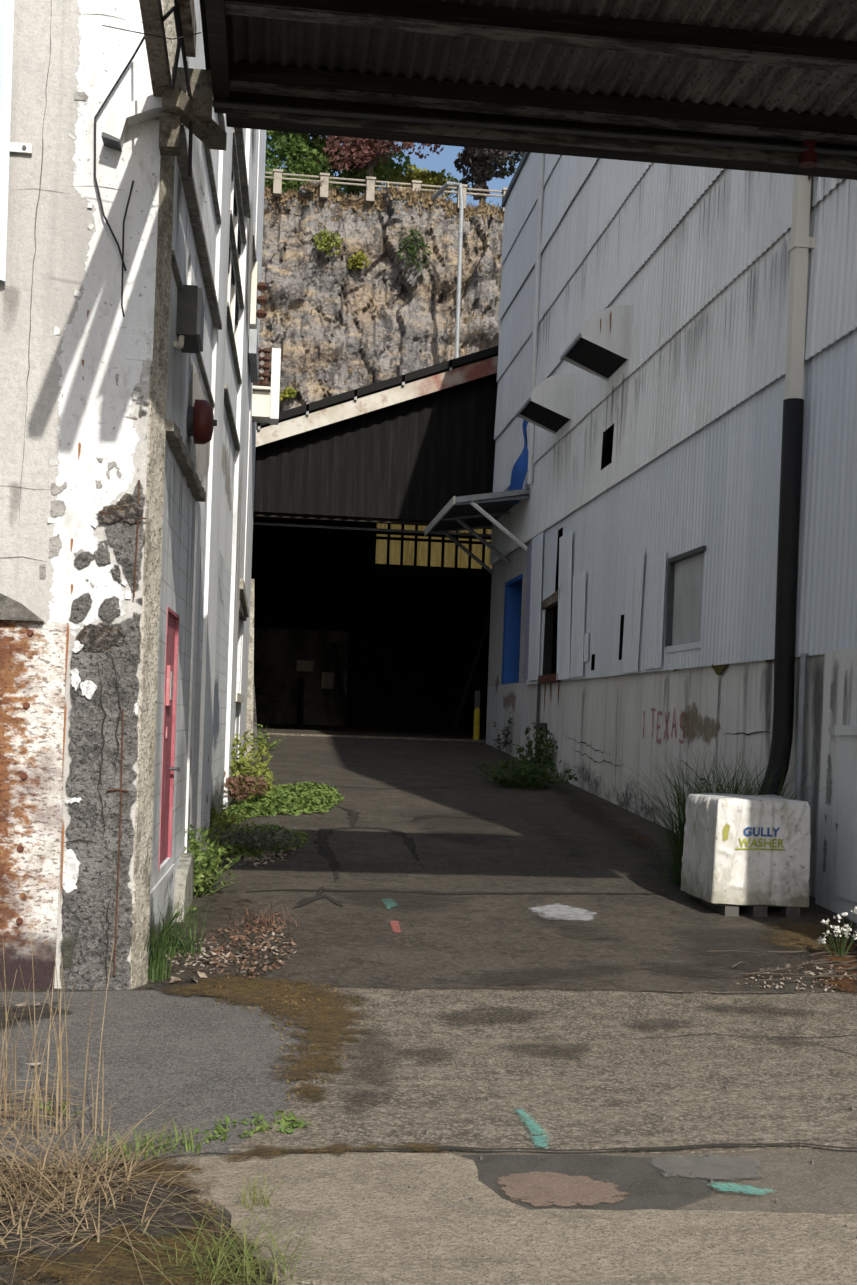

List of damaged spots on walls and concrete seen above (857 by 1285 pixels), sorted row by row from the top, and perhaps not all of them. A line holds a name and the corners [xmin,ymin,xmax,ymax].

peeling [74,92,89,101]
crack [11,14,120,515]
peeling [124,333,151,419]
spalling [39,458,146,990]
damp [681,702,720,744]